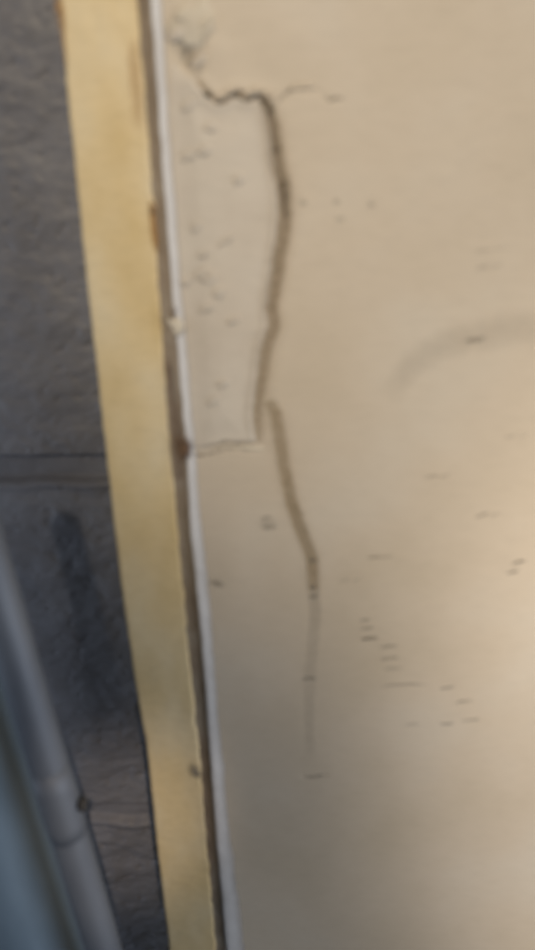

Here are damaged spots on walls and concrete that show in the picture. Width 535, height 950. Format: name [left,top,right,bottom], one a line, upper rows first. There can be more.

crack [204,81,333,110]